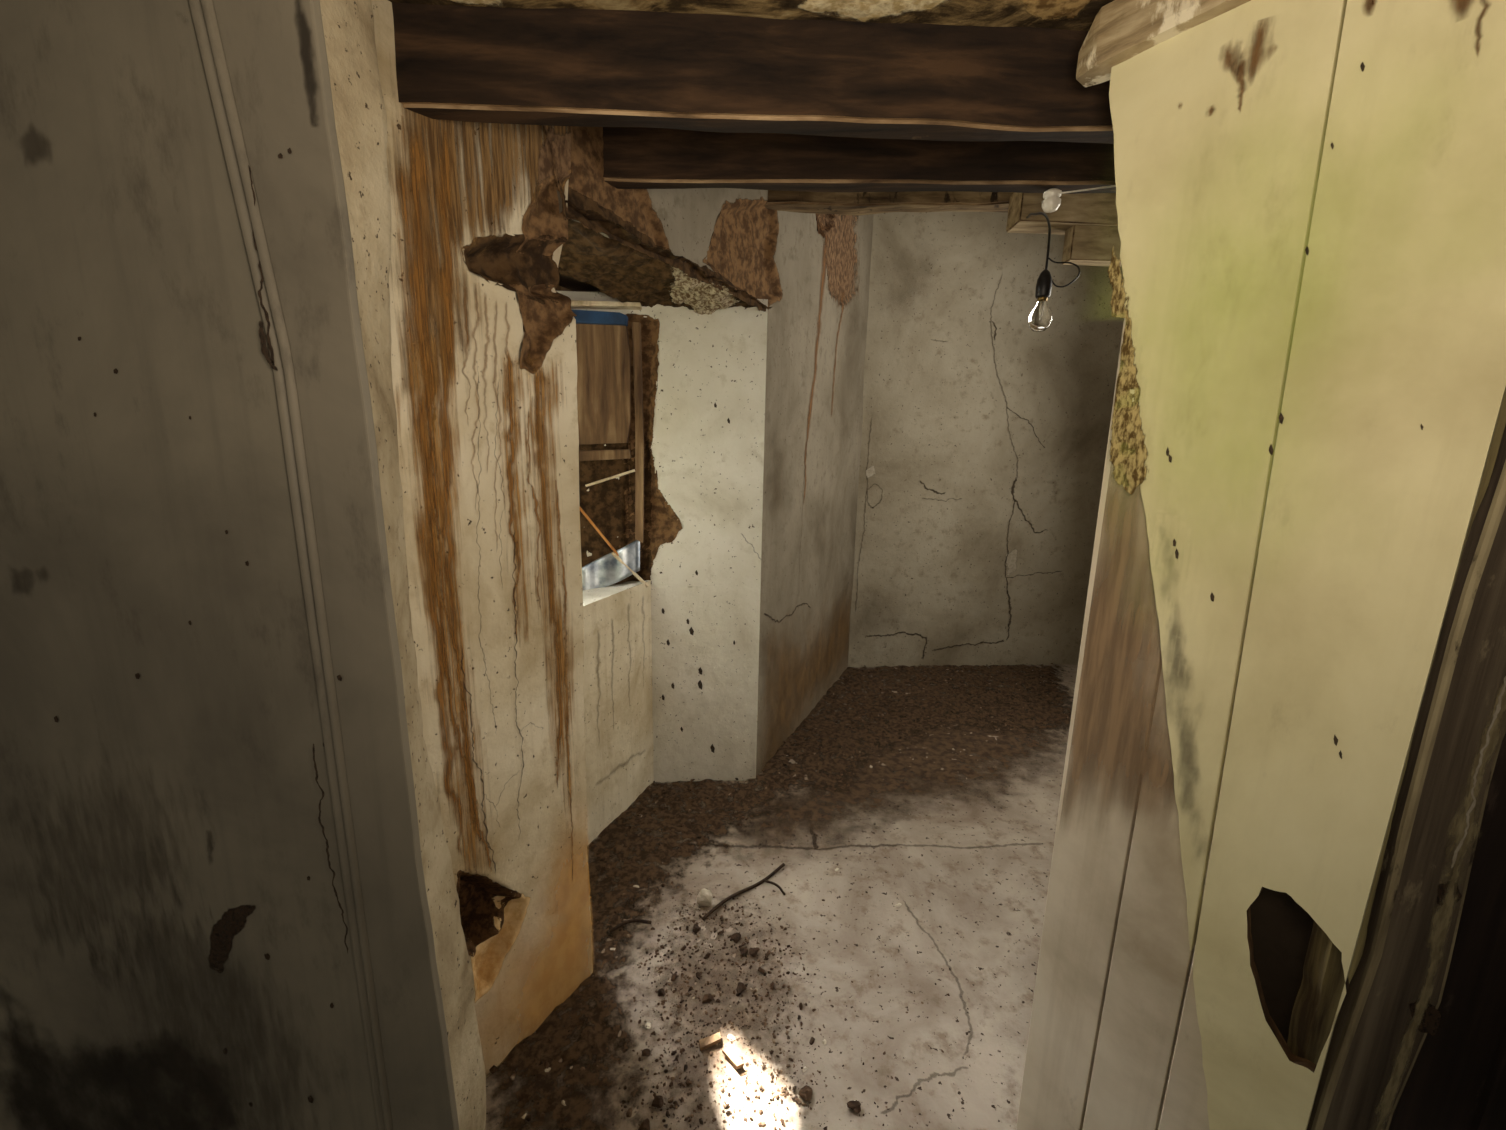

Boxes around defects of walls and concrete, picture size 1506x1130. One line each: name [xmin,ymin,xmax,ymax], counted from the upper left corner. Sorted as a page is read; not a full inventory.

peeling [799,0,946,22]
peeling [1023,0,1091,20]
leakage [1225,25,1264,110]
leakage [1455,0,1489,53]
flaking render [461,125,783,588]
corrosion [804,224,844,498]
corrosion [397,137,492,871]
corrosion [503,354,573,880]
crack [867,479,1061,658]
crack [313,744,348,953]
flaking render [457,870,531,1003]
crack [810,827,818,849]